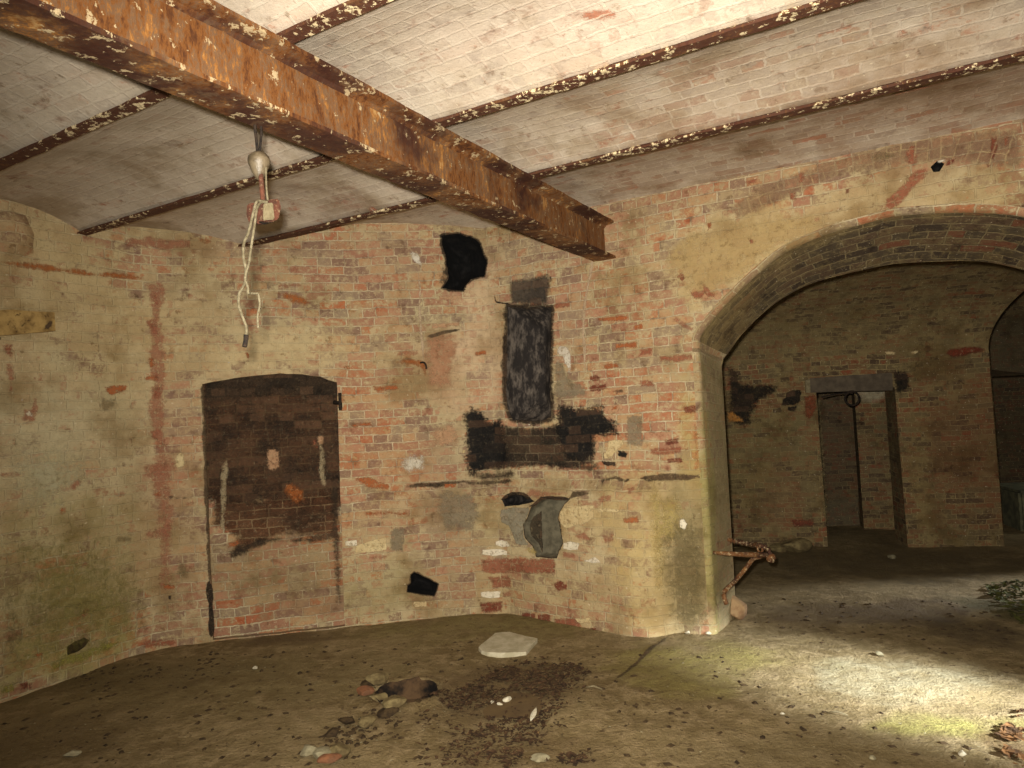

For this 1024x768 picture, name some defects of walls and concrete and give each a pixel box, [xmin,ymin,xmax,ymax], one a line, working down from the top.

hole [440,232,488,292]
water stain [294,436,340,587]
water stain [231,539,277,557]
flaking render [480,490,610,613]
hole [407,572,439,597]